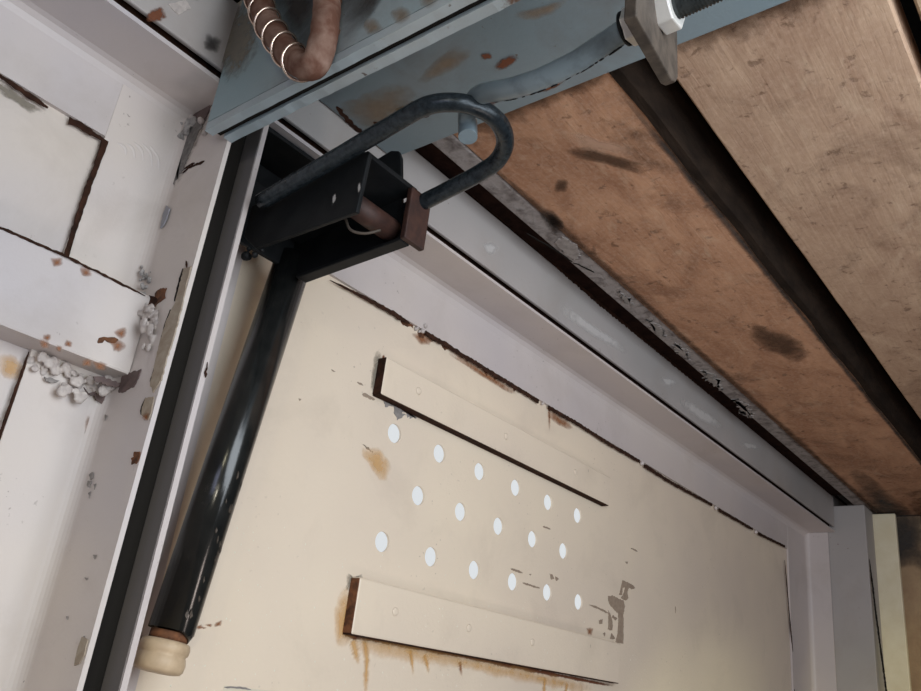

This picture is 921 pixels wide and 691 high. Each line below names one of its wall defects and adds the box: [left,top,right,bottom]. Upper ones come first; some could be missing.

corrosion [482,54,516,69]
peeling [173,105,211,184]
peeling [140,261,192,420]
corrosion [372,355,608,506]
corrosion [339,578,618,691]
peeling [588,580,635,644]